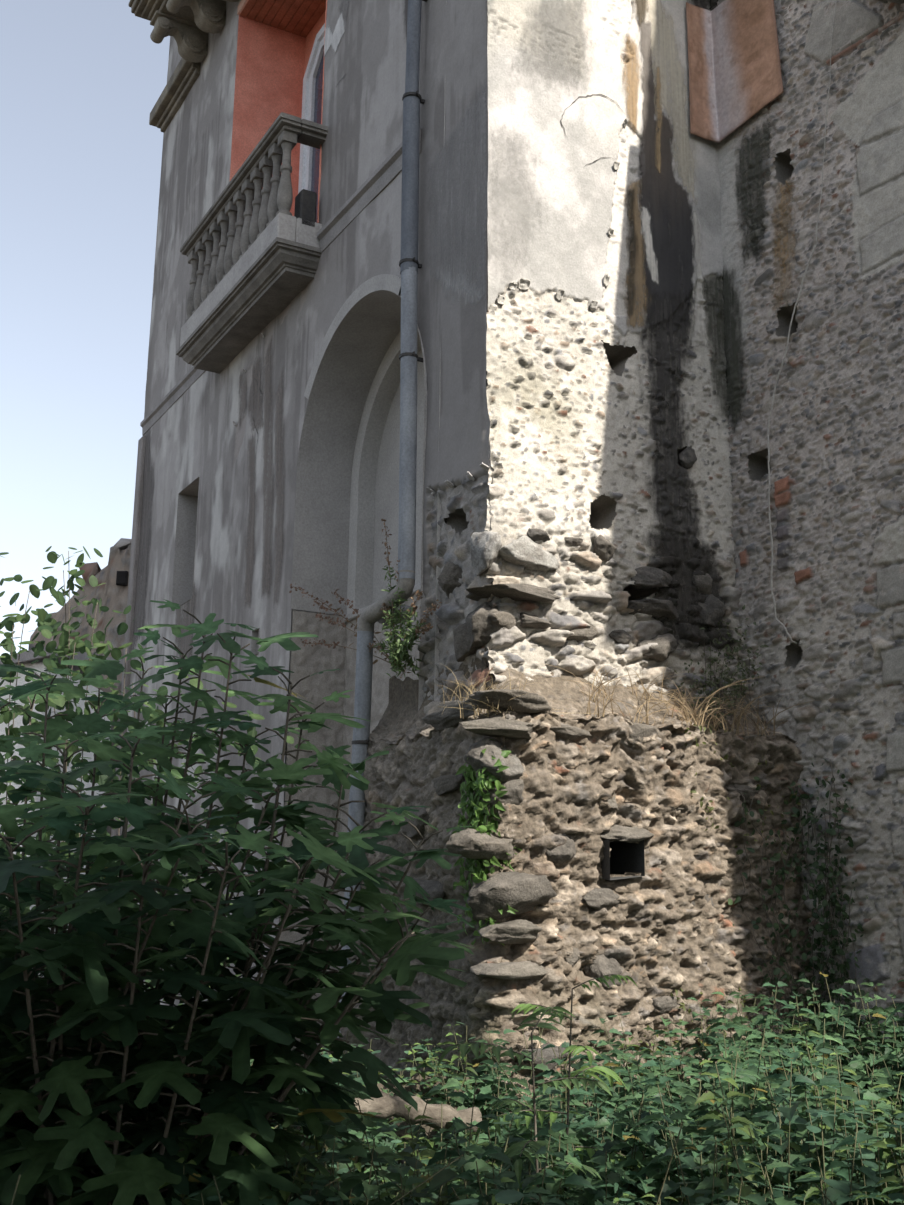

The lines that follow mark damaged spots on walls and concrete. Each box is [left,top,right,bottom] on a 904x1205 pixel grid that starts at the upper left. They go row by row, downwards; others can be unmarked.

crack [560,94,622,137]
flaking render [417,118,771,714]
damp [635,0,746,651]
damp [736,123,770,258]